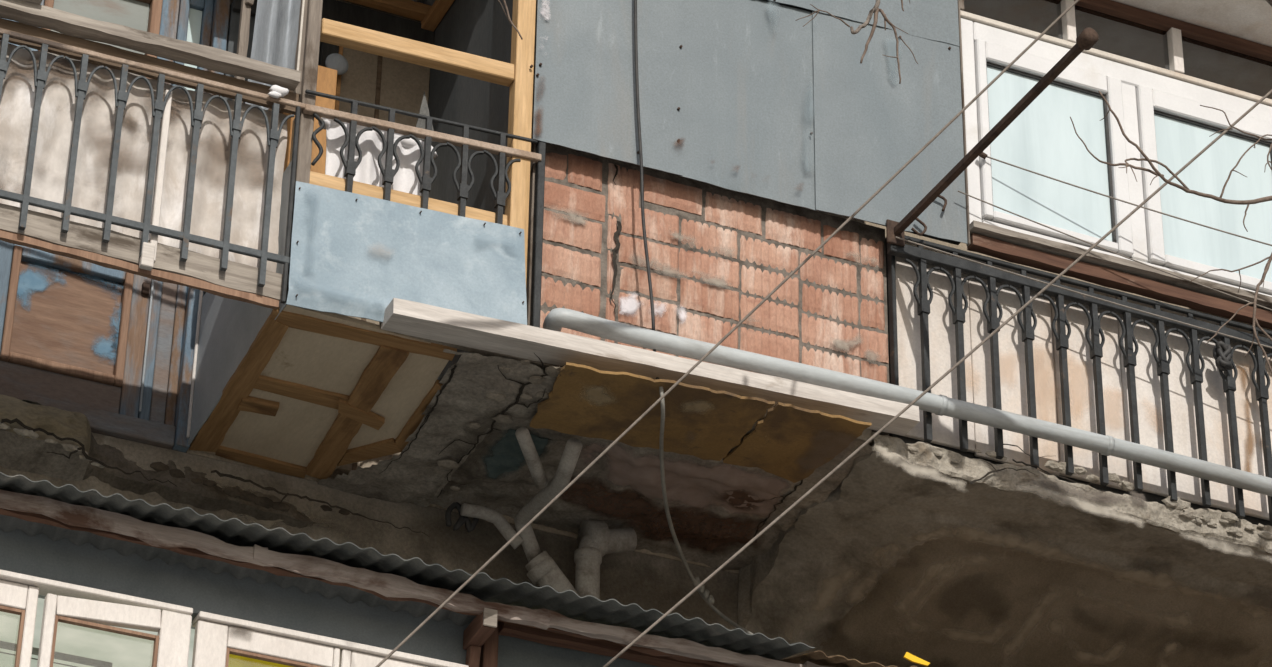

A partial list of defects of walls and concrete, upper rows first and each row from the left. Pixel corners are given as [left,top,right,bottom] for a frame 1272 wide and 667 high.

peeling [17,261,122,305]
crack [610,221,622,315]
crack [1,418,176,486]
crack [211,470,429,537]
crack [379,353,565,498]
peeling [468,360,562,479]
flaking render [582,443,789,517]
flaking render [875,437,965,487]
flaking render [1022,486,1142,524]
spalling [1044,460,1134,491]
spalling [1161,496,1272,555]
leakage [895,525,1227,630]